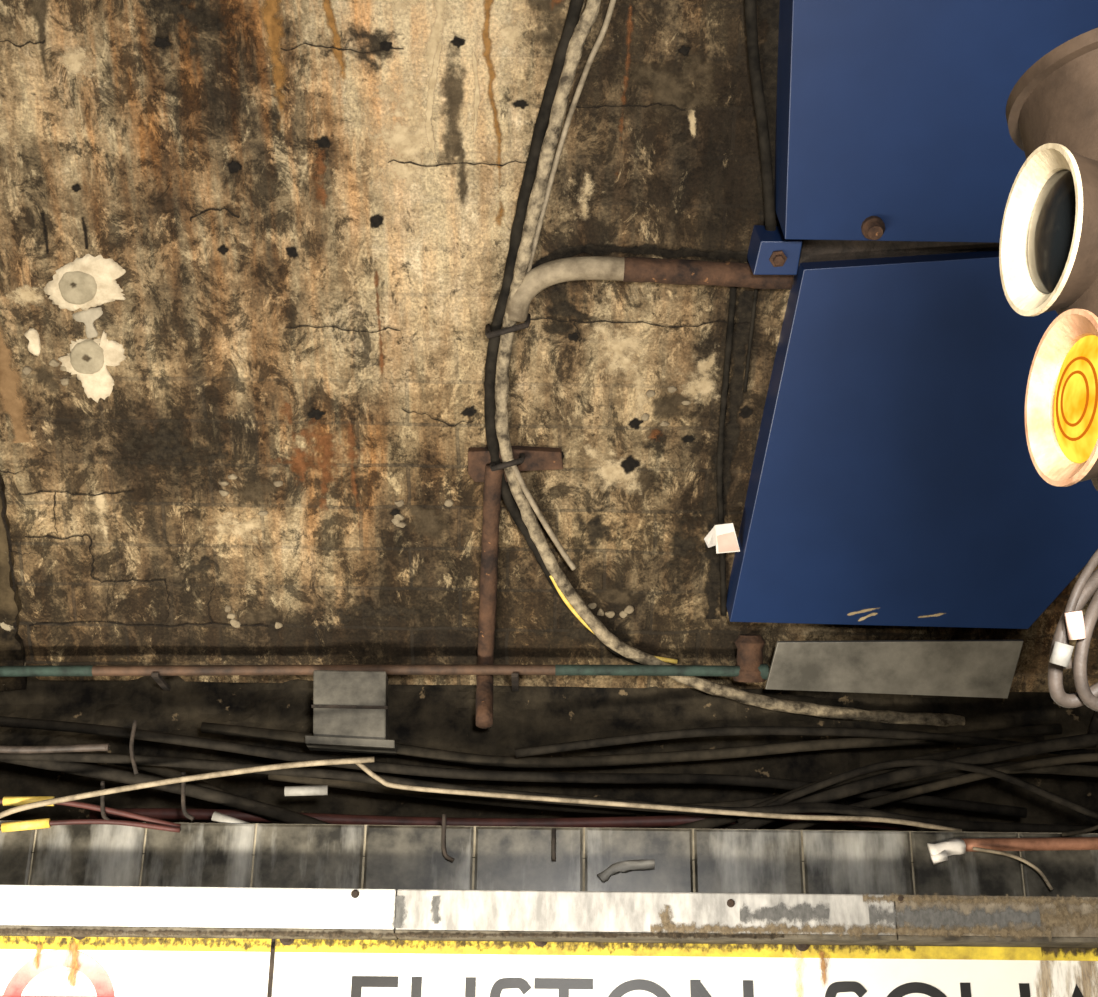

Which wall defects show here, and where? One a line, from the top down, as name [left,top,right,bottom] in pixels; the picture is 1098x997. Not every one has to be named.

corrosion [261,0,285,112]
corrosion [323,0,345,78]
leakage [348,23,396,72]
leakage [368,42,480,203]
corrosion [482,0,502,175]
crack [388,159,527,167]
leakage [580,174,593,218]
leakage [536,286,647,420]
efflorescence [682,354,717,400]
leakage [94,493,108,541]
leakage [575,446,642,555]
corrosion [67,942,80,987]